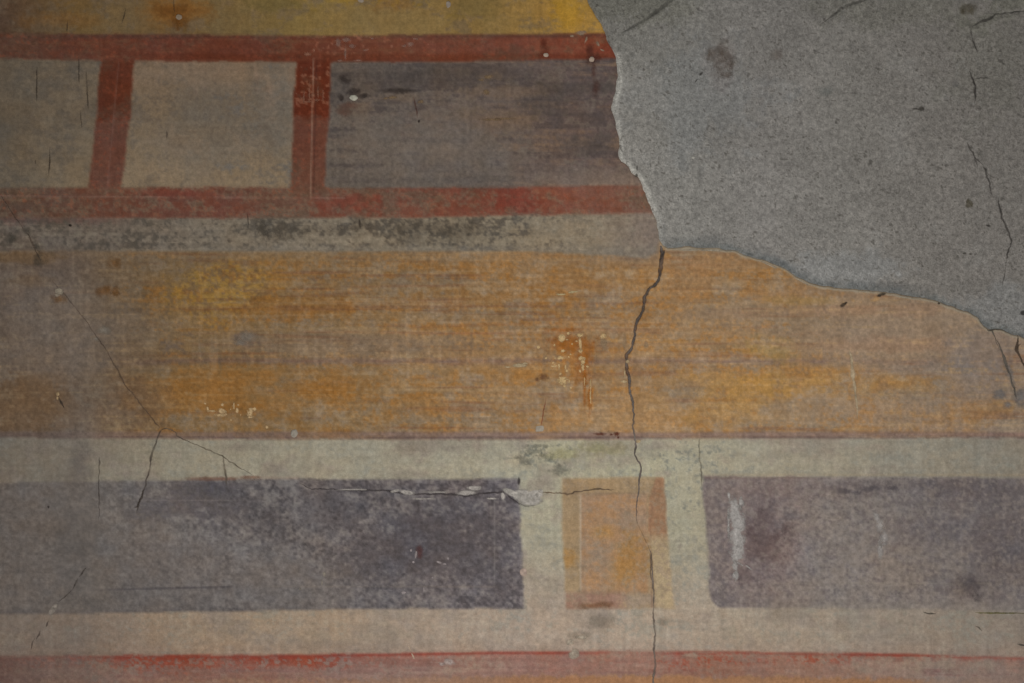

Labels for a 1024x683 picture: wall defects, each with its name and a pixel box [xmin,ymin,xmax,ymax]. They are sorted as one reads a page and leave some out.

flaking render [570,0,1024,338]
crack [135,412,244,509]
crack [304,485,515,501]
crack [543,246,665,683]